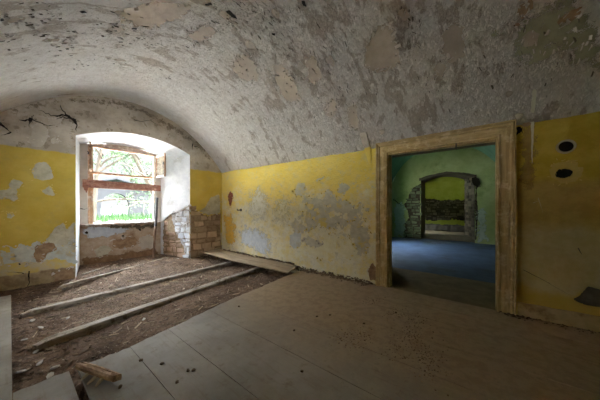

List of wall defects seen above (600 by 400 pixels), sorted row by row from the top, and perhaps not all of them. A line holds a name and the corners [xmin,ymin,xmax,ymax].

peeling [88,11,162,51]
peeling [186,0,356,113]
crack [21,105,78,130]
peeling [0,178,24,203]
peeling [29,162,55,196]
peeling [0,221,78,282]
flaking render [92,229,154,260]
flaking render [163,194,221,259]
peeling [288,183,372,256]